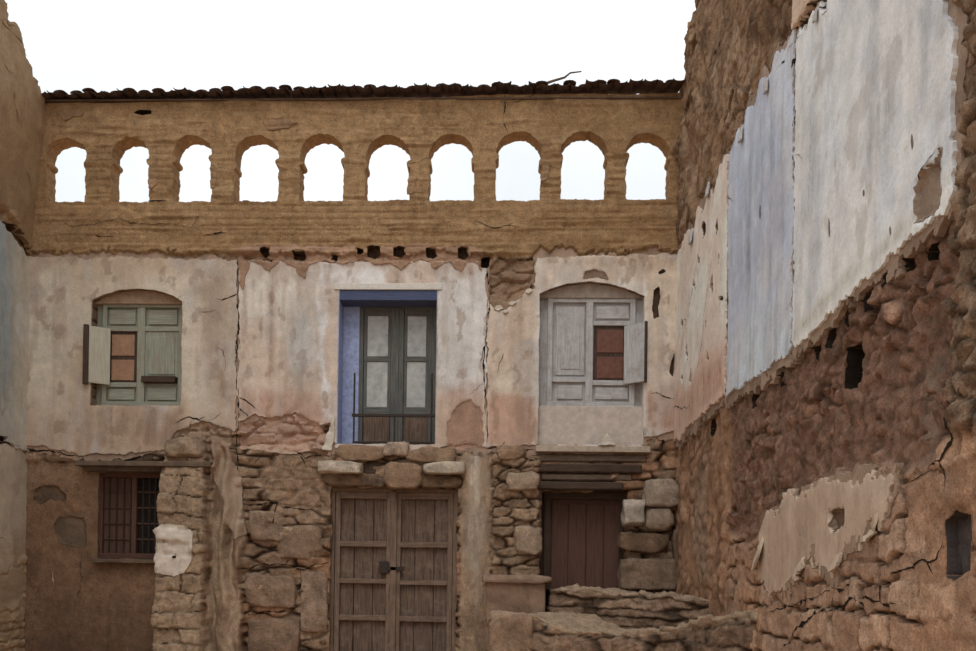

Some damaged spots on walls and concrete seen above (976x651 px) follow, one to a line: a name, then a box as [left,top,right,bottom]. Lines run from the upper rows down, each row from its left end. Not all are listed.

spalling [913,147,943,224]
spalling [237,243,536,313]
crack [470,271,534,451]
crack [0,441,79,457]
spalling [164,414,335,473]
spalling [447,399,484,451]
crack [908,380,960,488]
spalling [33,485,67,504]
spalling [827,508,845,532]
peeling [751,537,764,571]